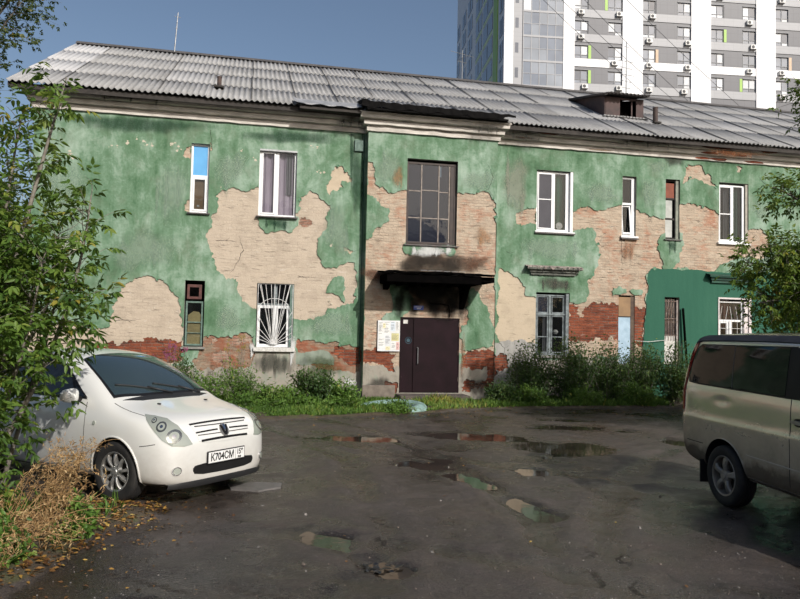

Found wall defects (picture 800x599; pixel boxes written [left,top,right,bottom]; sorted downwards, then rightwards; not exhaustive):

peeling [683,146,777,189]
peeling [28,162,538,393]
leakage [394,285,468,316]
leakage [403,246,485,271]
peeling [569,205,665,358]
peeling [673,203,769,272]